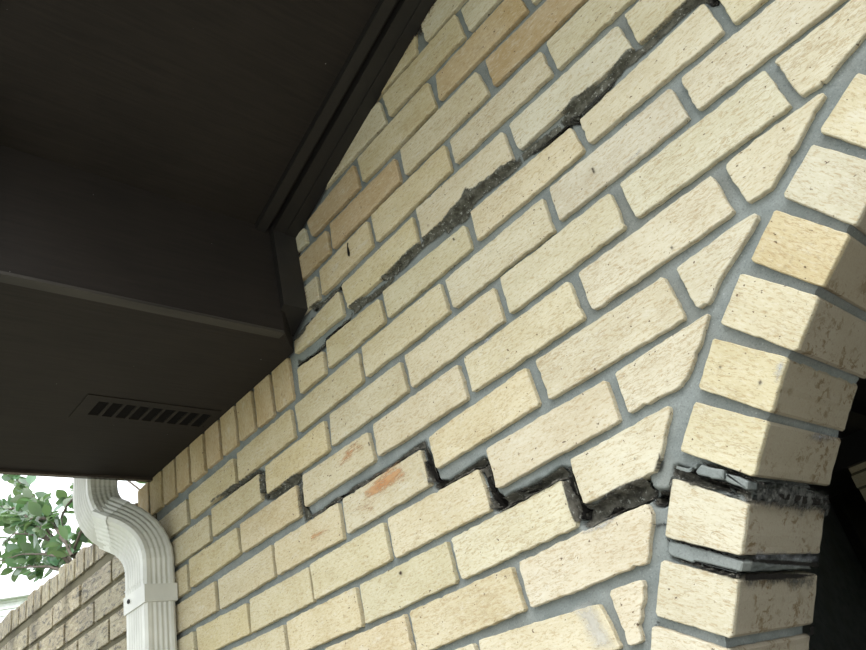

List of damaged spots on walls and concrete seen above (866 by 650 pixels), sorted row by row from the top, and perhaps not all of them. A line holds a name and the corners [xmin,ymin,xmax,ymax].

crack [294,0,719,367]
crack [211,441,831,581]